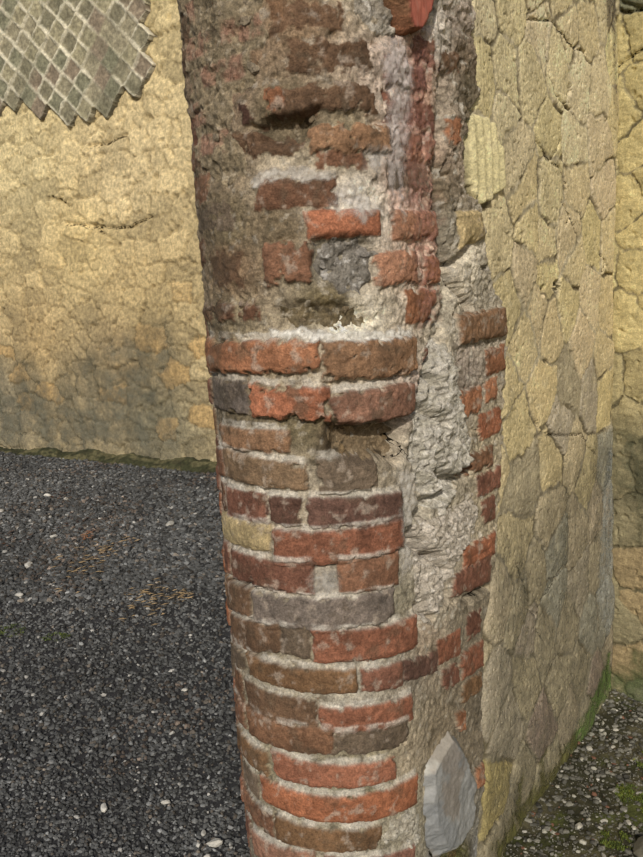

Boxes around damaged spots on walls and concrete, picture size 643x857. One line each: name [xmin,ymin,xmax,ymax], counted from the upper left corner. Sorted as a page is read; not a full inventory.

peeling [350,0,434,37]
spalling [184,0,269,187]
spalling [257,114,315,144]
spalling [312,237,379,295]
spalling [278,300,365,330]